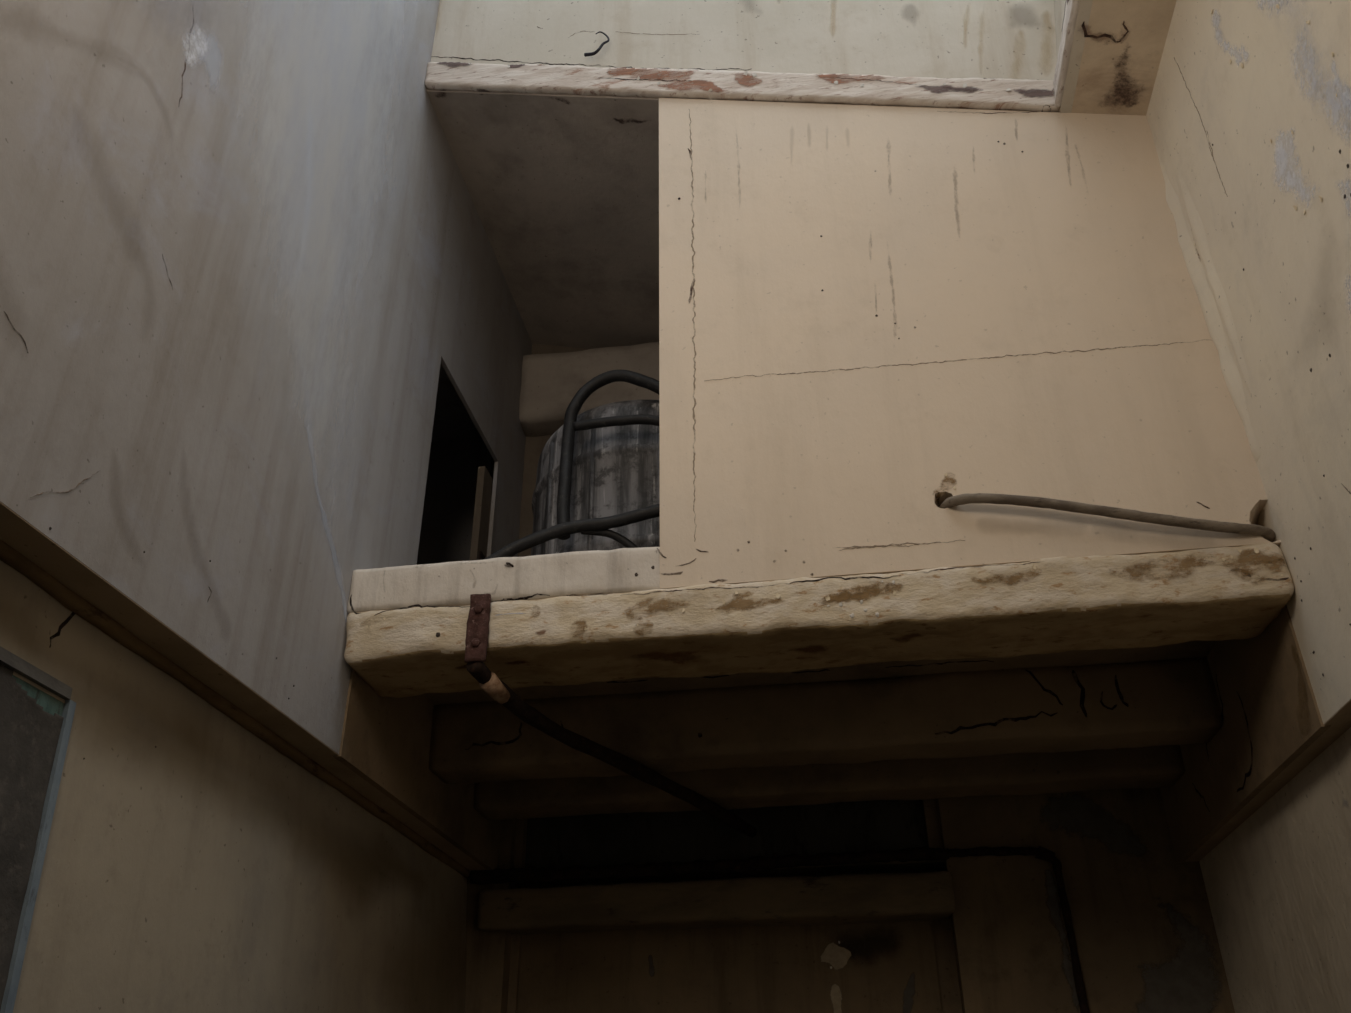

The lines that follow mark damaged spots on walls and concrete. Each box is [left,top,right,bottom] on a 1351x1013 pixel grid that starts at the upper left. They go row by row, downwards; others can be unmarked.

crack [1062,2,1129,43]
crack [432,26,750,82]
peeling [607,67,761,100]
peeling [816,74,880,87]
peeling [919,83,978,93]
peeling [1006,88,1055,97]
crack [350,113,1182,615]
crack [935,670,1129,735]